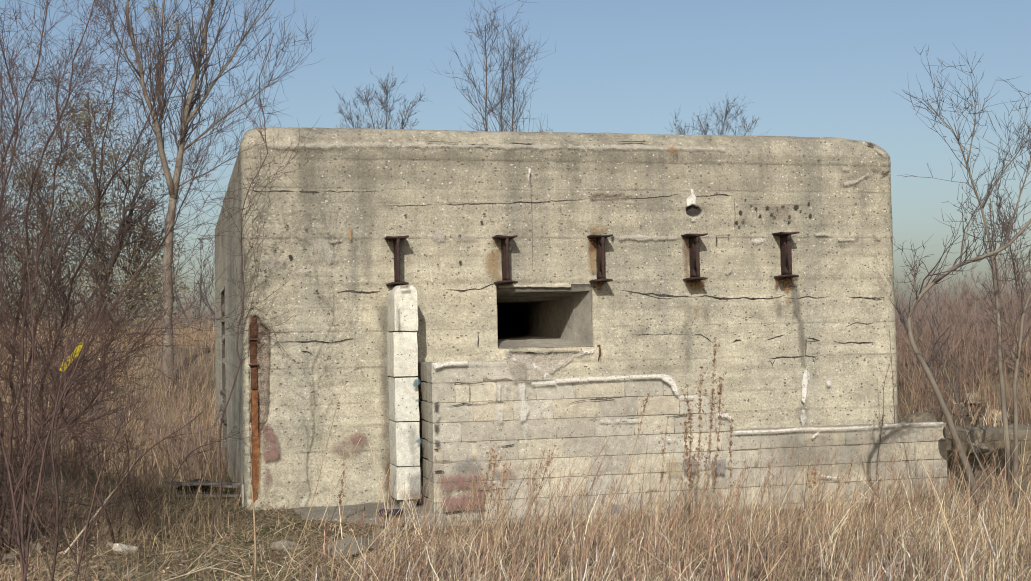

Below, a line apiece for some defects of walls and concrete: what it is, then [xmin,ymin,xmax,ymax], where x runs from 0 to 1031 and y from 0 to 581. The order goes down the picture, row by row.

corrosion [589,227,603,290]
corrosion [686,266,705,288]
crack [622,290,824,300]
spalling [248,316,279,494]